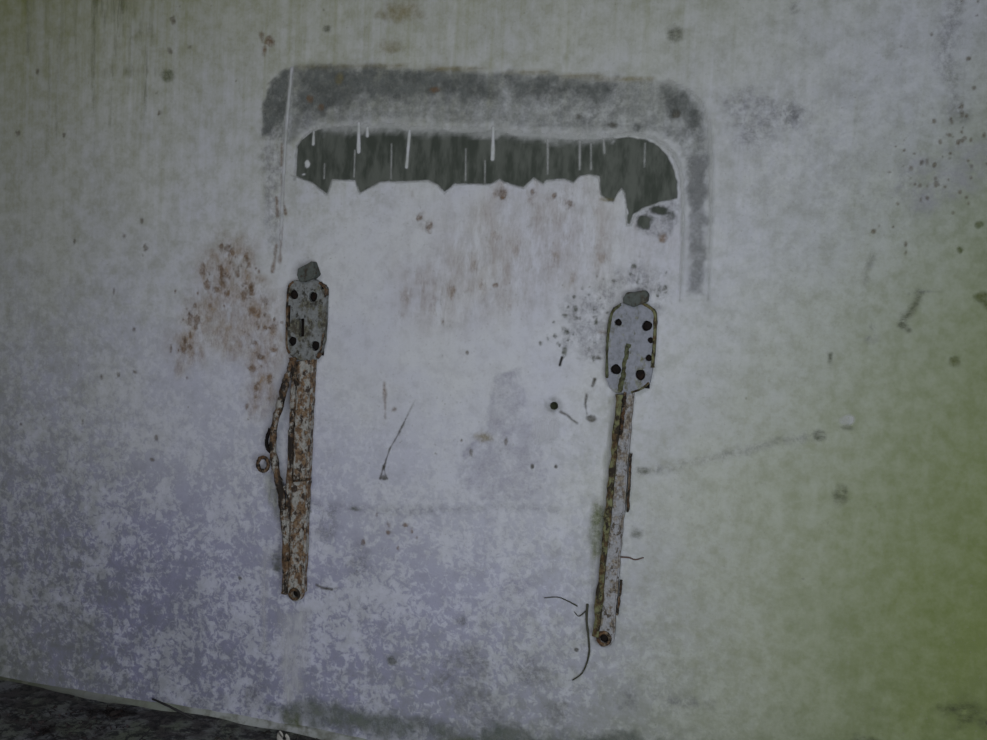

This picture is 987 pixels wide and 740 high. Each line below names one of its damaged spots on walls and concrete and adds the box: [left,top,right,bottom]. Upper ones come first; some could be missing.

peeling [264,67,707,289]
corrosion [250,281,294,390]
corrosion [605,303,622,378]
corrosion [641,303,658,368]
corrosion [619,382,649,437]